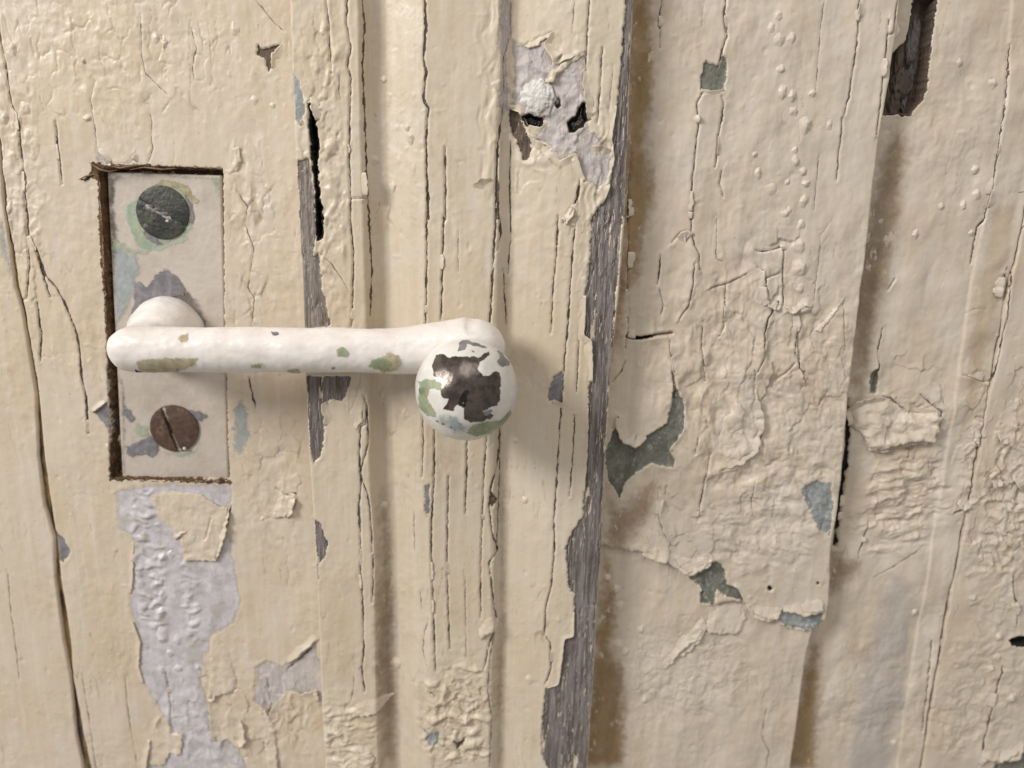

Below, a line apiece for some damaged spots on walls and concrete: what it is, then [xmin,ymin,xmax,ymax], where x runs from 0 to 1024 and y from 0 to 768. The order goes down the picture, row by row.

crack [0,32,96,767]
peeling [297,158,331,328]
peeling [306,375,351,462]
crack [422,0,459,324]
crack [489,3,511,322]
peeling [499,0,689,768]
crack [614,98,807,398]
crack [968,266,1012,383]
peeling [116,483,258,768]
peeling [254,635,322,721]
crack [413,418,501,767]
peeling [642,550,750,605]